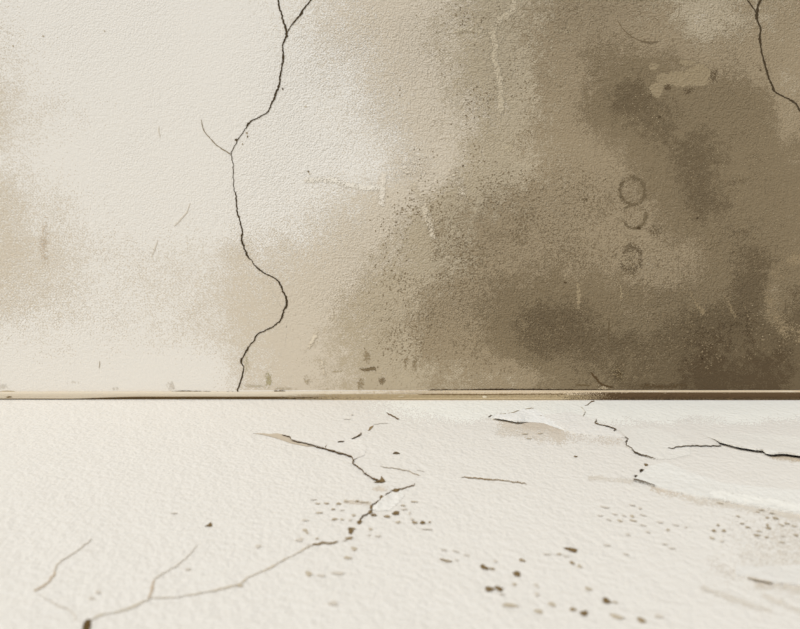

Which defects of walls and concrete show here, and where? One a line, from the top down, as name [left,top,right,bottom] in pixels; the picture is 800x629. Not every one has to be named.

crack [747,0,800,112]
crack [182,0,312,392]
water stain [0,0,800,400]
spalling [254,433,315,447]
crack [285,433,424,520]
crack [418,373,653,458]
crack [669,443,800,457]
crack [34,539,338,620]